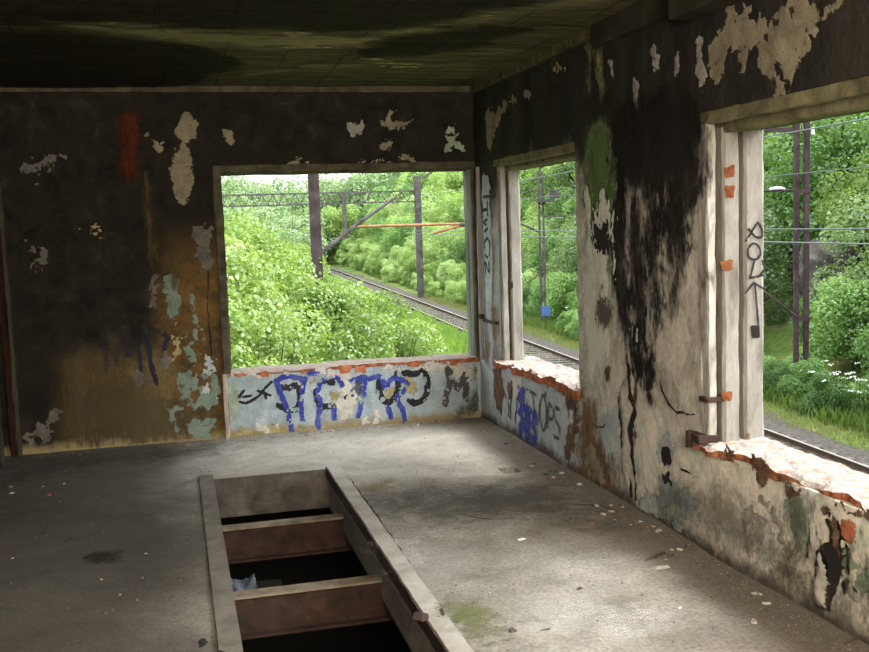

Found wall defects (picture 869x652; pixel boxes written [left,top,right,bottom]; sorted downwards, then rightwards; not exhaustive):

leakage [58,22,447,50]
peeling [695,0,843,109]
peeling [168,112,199,206]
peeling [347,120,365,137]
peeling [358,110,416,163]
peeling [444,123,465,153]
leakage [576,119,691,405]
peeling [147,273,221,439]
spalling [231,364,381,426]
spalling [380,359,478,396]
peeling [492,364,621,485]
peeling [720,443,812,558]